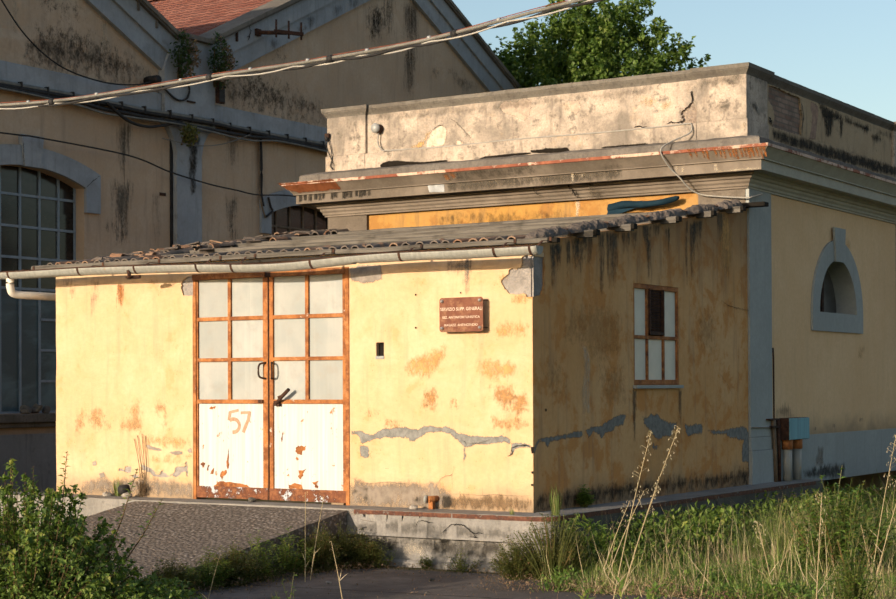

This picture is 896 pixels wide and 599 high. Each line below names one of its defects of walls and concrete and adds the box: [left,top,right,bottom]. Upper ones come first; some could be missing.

leakage [30,33,129,78]
leakage [773,103,896,177]
leakage [116,185,129,240]
leakage [550,226,670,281]
spalling [502,255,543,303]
peeling [119,462,188,478]
rust [201,450,249,487]
rust [289,446,318,489]